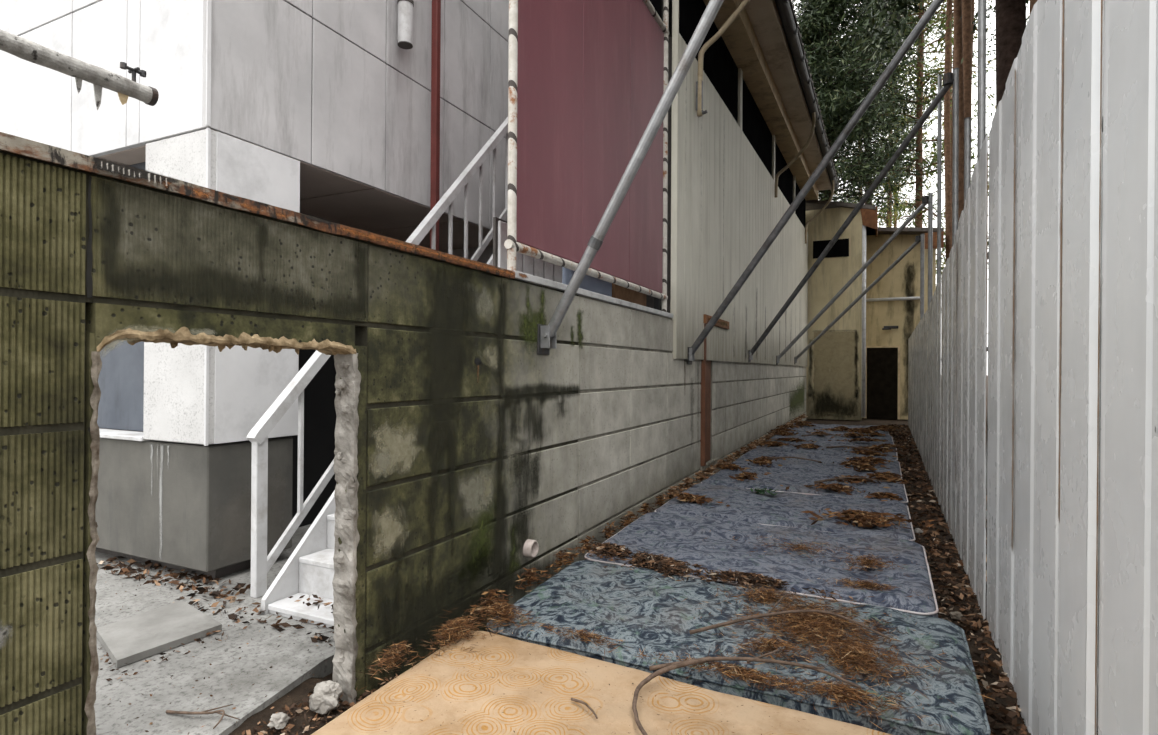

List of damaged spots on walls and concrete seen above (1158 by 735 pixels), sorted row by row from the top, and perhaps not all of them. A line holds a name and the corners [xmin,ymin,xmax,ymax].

rust [338,227,528,278]
water stain [571,310,583,348]
water stain [151,444,169,544]
spalling [84,326,419,735]
water stain [381,272,580,677]